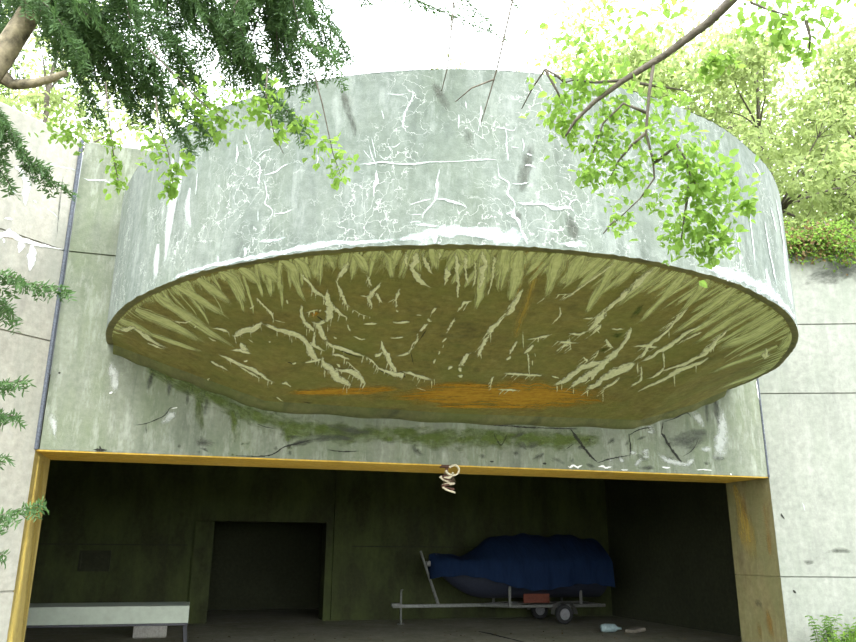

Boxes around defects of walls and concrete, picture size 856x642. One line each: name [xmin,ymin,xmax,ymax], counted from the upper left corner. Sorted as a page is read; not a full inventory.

crack [245,134,291,216]
crack [364,93,574,244]
damp [112,201,795,398]
rust [295,379,604,409]
crack [236,440,309,457]
crack [494,413,697,463]